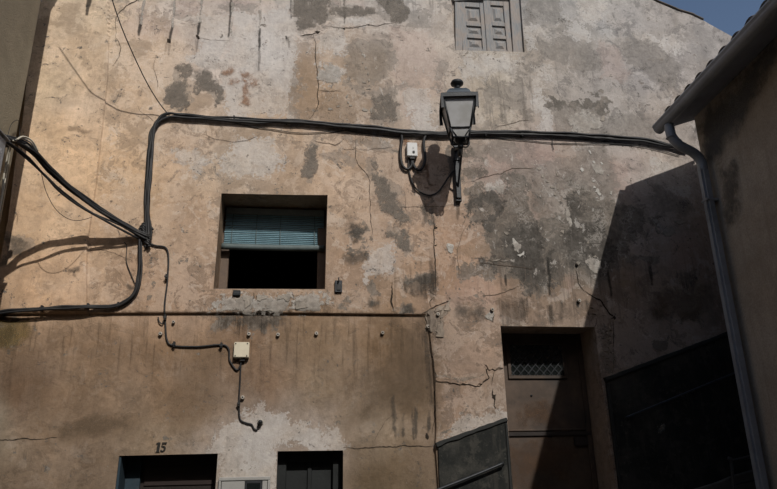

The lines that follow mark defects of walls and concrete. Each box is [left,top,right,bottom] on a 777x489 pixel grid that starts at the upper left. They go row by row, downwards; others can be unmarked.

crack [301,23,390,116]
crack [314,140,393,242]
peeling [493,230,524,262]
peeling [585,240,602,273]
spalling [208,291,334,316]
crack [576,271,616,373]
crack [349,341,498,449]